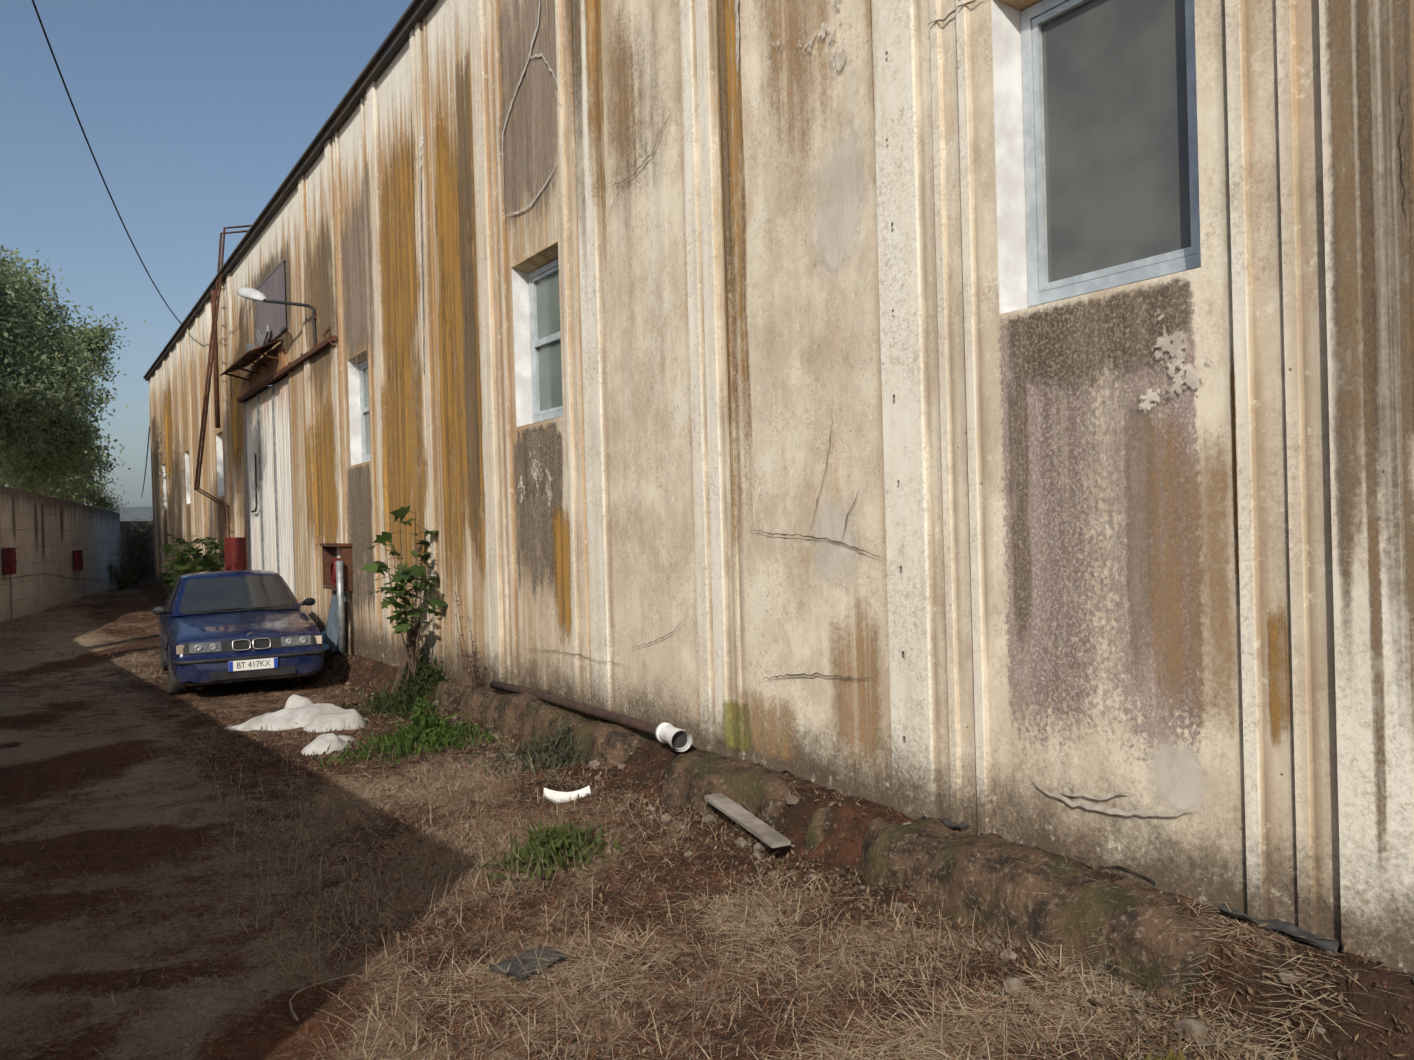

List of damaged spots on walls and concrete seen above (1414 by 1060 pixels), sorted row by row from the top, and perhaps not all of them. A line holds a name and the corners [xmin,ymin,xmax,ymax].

crack [927,0,976,28]
rust [381,58,486,591]
leakage [514,423,563,594]
rust [552,509,571,637]
crack [754,422,882,558]
leakage [998,279,1203,766]
crack [764,672,875,680]